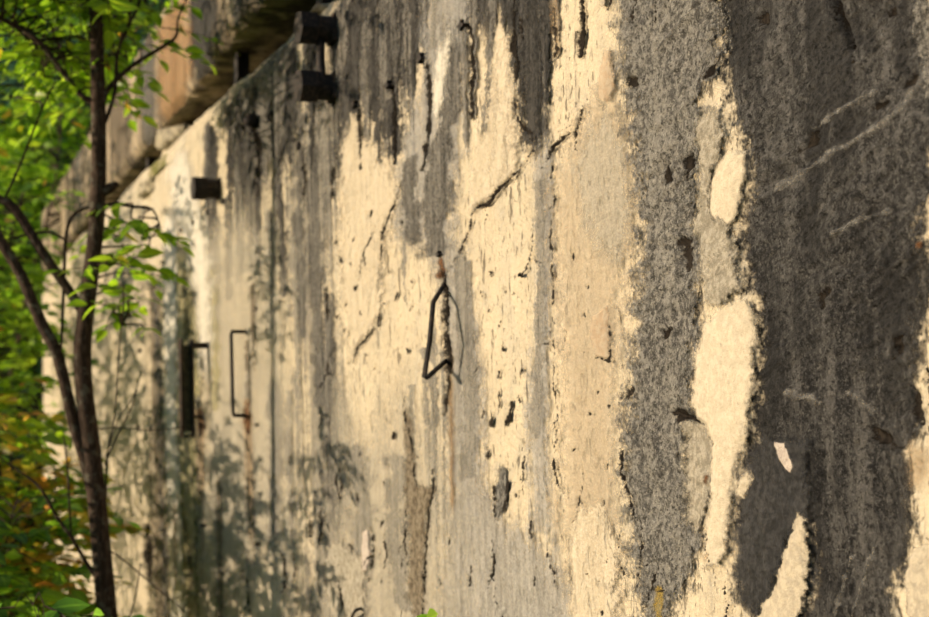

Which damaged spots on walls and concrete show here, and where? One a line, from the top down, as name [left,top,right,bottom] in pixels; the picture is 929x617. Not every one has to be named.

leakage [91,0,634,617]
crack [448,98,588,523]
leakage [907,245,929,383]
leakage [71,442,86,498]
leakage [74,535,95,614]
leakage [726,435,814,617]
leakage [898,453,912,566]